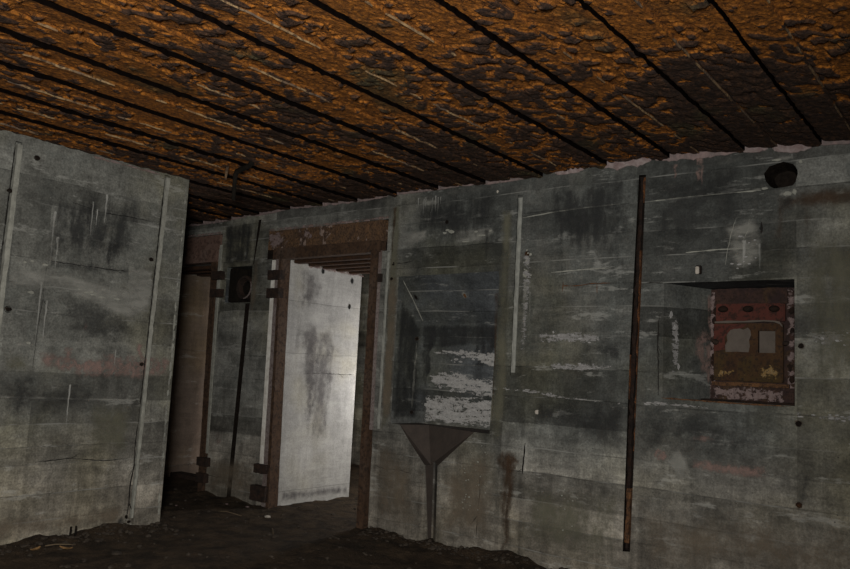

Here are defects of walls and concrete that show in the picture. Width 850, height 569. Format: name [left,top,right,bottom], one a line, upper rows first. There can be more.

damp [307,347,329,406]
peeling [424,349,495,428]
rust [498,454,516,542]
rust [624,488,633,543]